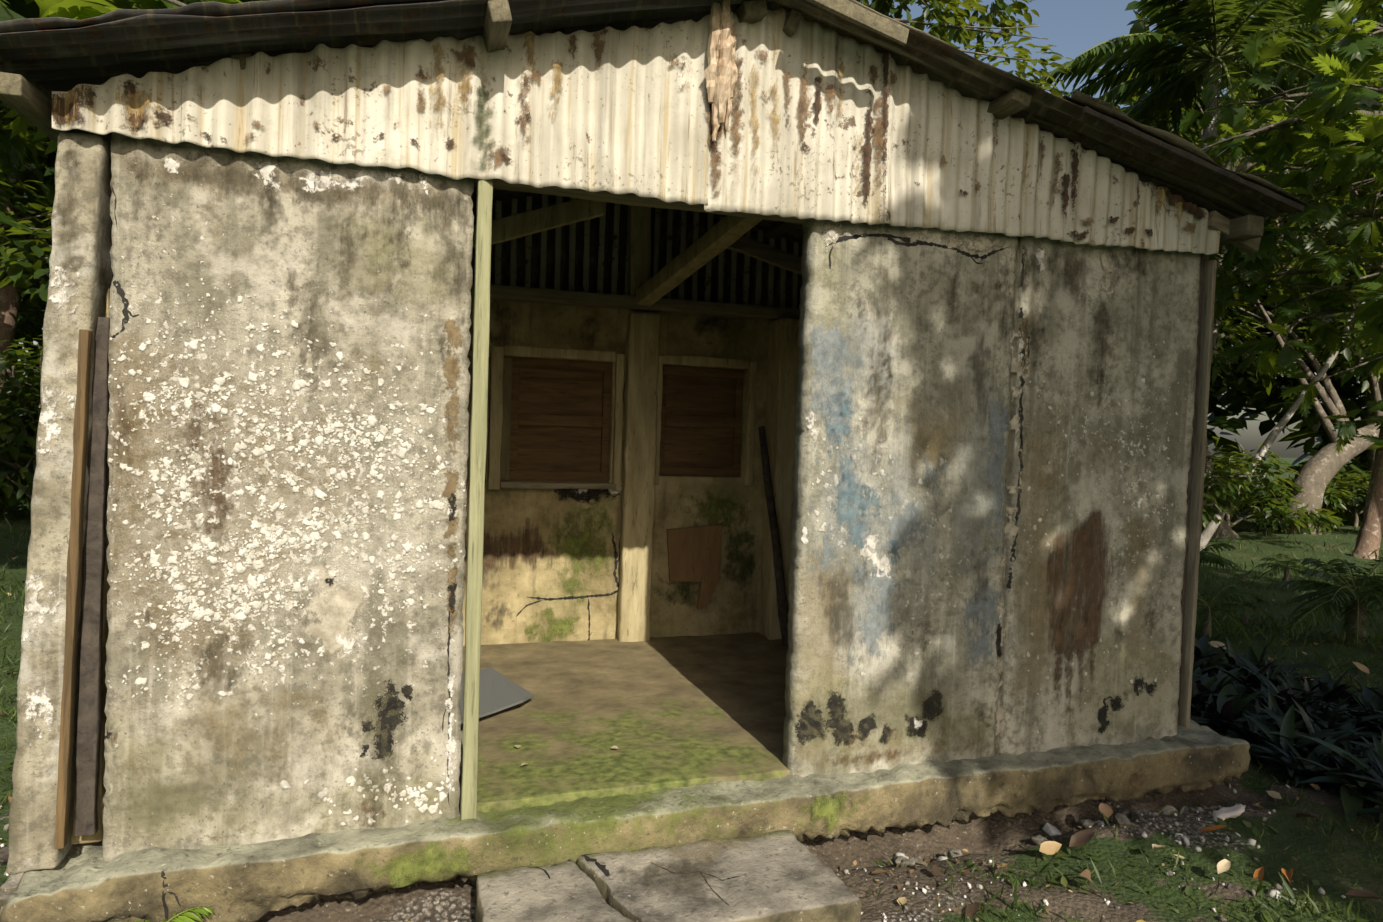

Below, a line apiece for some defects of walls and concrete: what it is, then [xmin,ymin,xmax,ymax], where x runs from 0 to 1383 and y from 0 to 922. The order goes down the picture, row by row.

rust [52,84,96,127]
rust [115,80,227,142]
rust [416,44,477,148]
rust [702,50,844,195]
rust [854,53,897,210]
rust [1023,136,1153,241]
rust [1150,181,1206,233]
crack [826,233,1030,589]
crack [517,533,620,640]
damp [360,679,413,760]
damp [795,690,943,766]
damp [1098,676,1157,733]